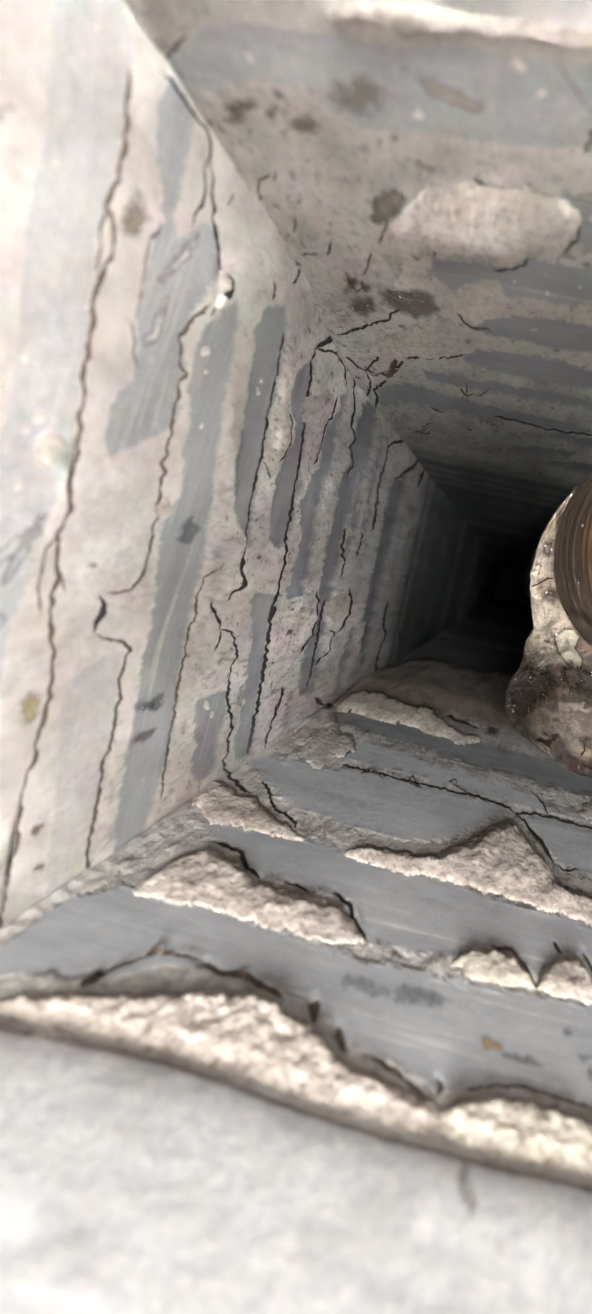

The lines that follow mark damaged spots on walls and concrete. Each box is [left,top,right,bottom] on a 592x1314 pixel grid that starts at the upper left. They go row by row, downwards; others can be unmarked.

peeling [388,182,583,268]
crack [363,221,388,275]
crack [492,258,530,273]
peeling [364,326,467,362]
crack [495,415,592,436]
crack [0,35,332,929]
crack [161,310,467,829]
peeling [323,589,349,623]
spalling [555,629,583,668]